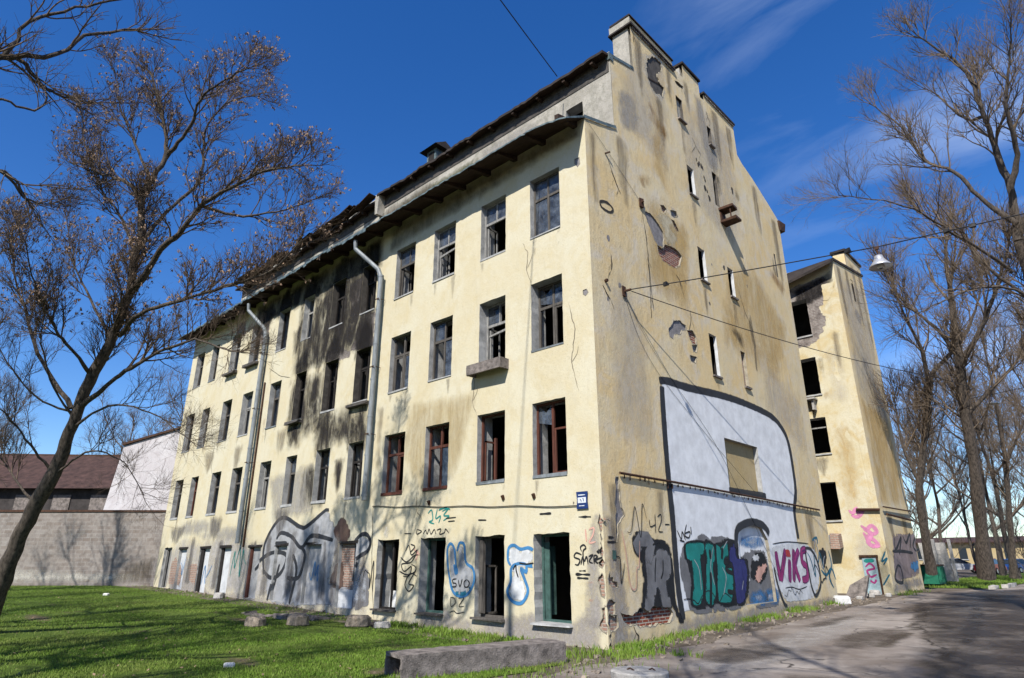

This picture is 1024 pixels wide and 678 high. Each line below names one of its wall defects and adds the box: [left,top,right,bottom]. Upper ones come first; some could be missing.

water stain [620,41,670,149]
spalling [645,55,683,99]
water stain [687,94,734,226]
spalling [645,204,683,268]
crack [568,303,579,390]
spalling [668,320,698,364]
spalling [789,276,833,348]
flaking render [166,534,282,605]
spalling [327,553,362,588]
flaking render [421,476,834,649]